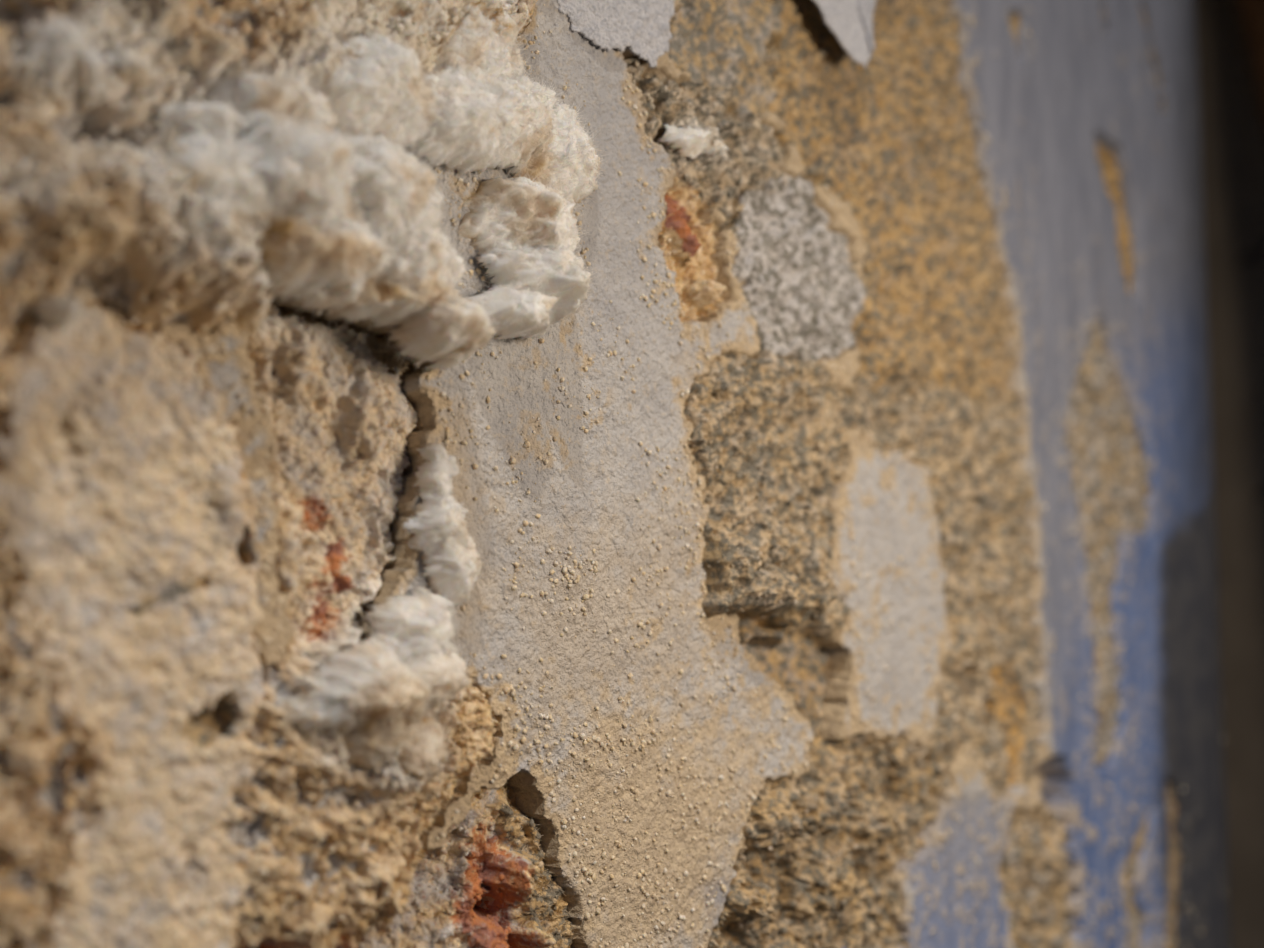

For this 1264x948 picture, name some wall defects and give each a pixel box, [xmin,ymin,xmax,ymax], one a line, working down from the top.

water stain [7,0,607,383]
water stain [284,438,490,787]
spalling [557,0,1043,948]
peeling [1064,319,1152,765]
flaking render [93,693,239,929]
flaking render [334,783,556,948]
spalling [998,809,1074,948]
peeling [1123,810,1150,948]
peeling [1163,782,1183,948]